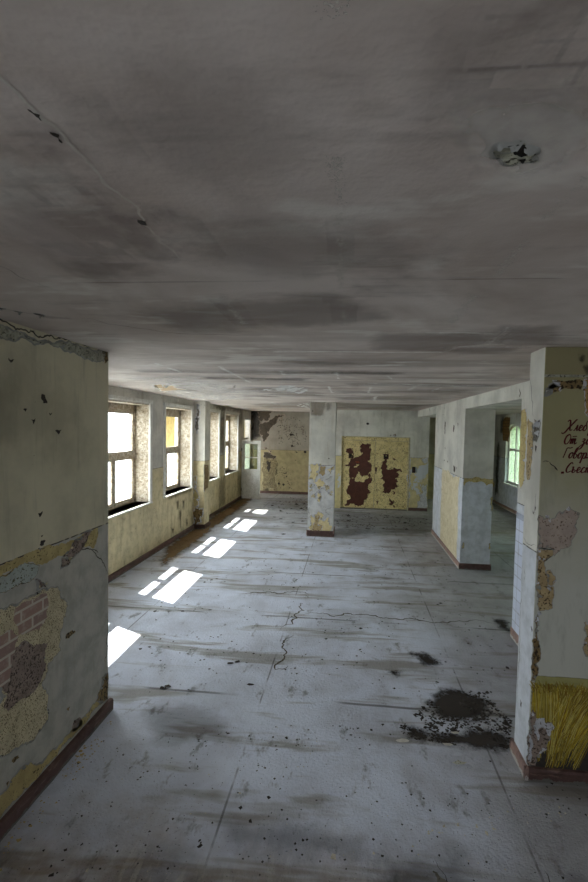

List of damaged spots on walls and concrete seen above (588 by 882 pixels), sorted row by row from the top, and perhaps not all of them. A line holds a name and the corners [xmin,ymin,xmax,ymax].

spalling [487,138,544,167]
flaking render [258,411,307,490]
peeling [308,443,429,531]
peeling [440,460,494,559]
peeling [502,408,541,489]
peeling [531,506,580,681]
spalling [0,528,109,818]